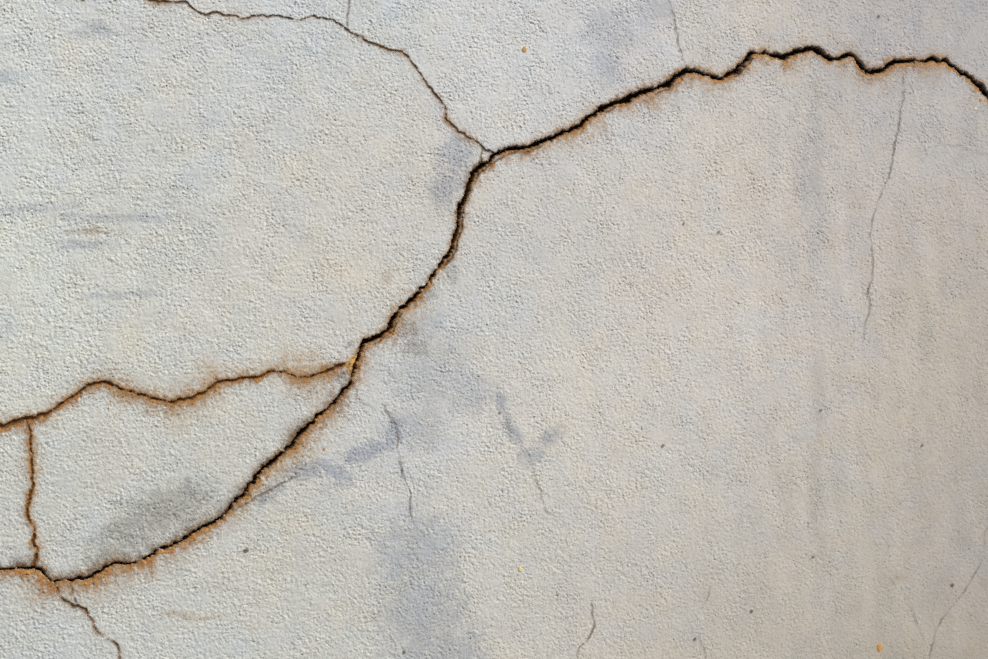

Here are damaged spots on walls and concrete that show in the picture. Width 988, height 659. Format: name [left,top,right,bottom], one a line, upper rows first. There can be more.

crack [959,74,988,99]
crack [0,371,295,659]
rust [0,380,354,589]
rust [117,368,273,408]
rust [278,362,346,384]
crack [142,0,952,560]
rust [351,49,988,378]